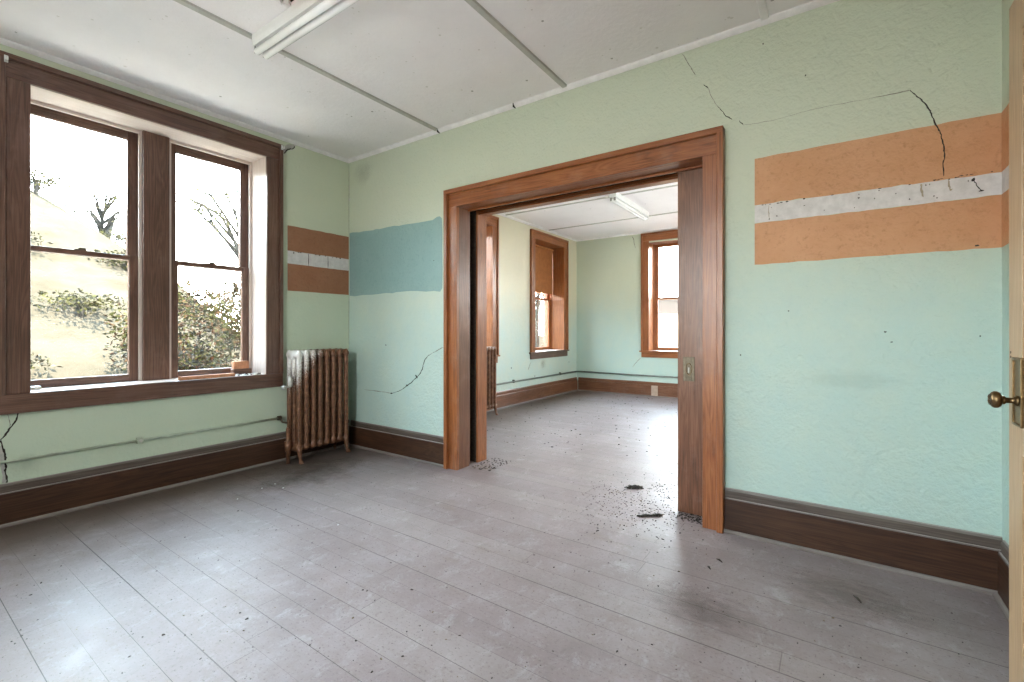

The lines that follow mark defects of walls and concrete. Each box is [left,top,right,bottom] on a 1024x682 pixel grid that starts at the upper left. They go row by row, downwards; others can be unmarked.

crack [683,55,945,176]
crack [364,347,443,394]
crack [0,413,19,483]